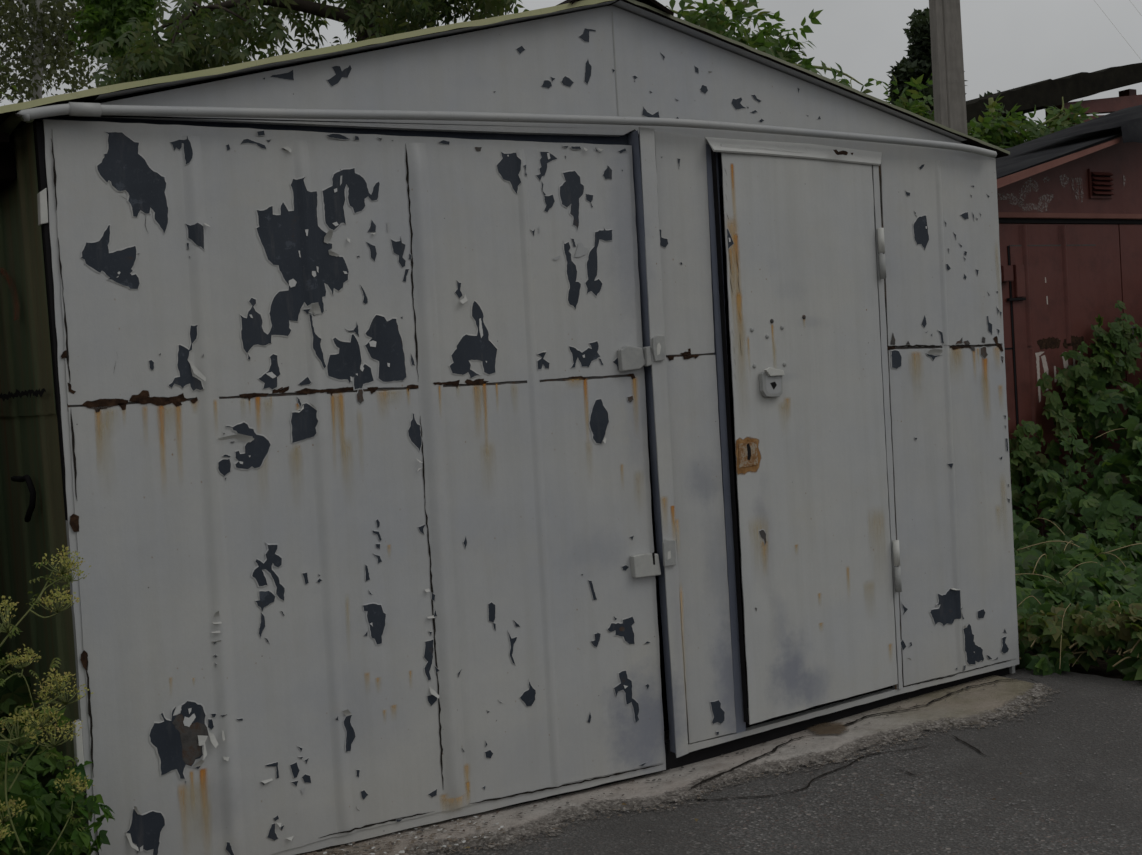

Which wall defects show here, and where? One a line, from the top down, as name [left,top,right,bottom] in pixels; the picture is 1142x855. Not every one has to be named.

peeling [96,130,169,234]
peeling [80,224,141,290]
peeling [239,167,415,405]
peeling [496,145,613,310]
peeling [448,280,498,379]
corrosion [68,383,198,445]
peeling [217,421,272,480]
corrosion [433,379,497,413]
corrosion [736,437,761,475]
peeling [929,588,1009,671]
peeling [148,700,243,784]
peeling [125,806,167,855]